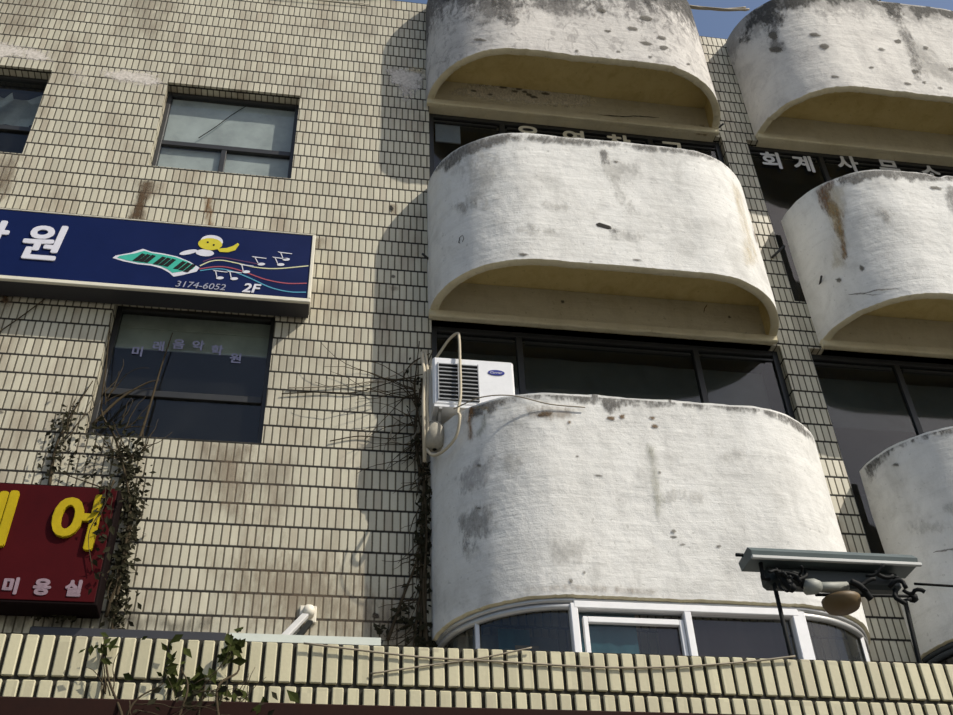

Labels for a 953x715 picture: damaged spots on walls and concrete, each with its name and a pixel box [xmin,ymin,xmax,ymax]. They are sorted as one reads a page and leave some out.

mould [473,0,519,24]
mould [530,0,603,14]
mould [644,0,695,26]
damp [739,0,854,48]
damp [870,0,953,70]
damp [839,170,953,210]
corrosion [817,182,847,258]